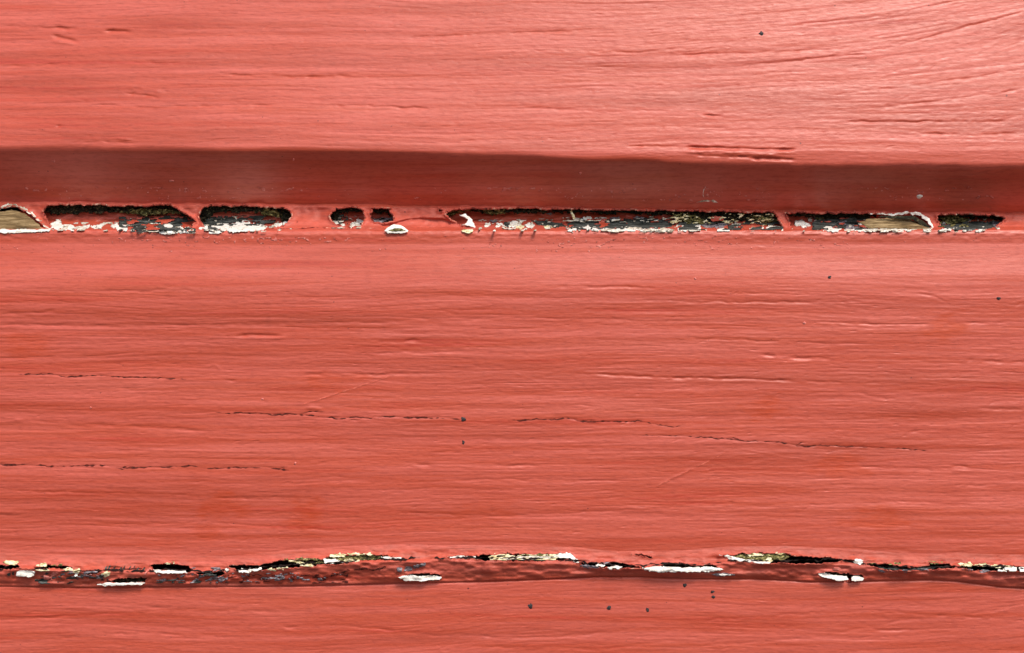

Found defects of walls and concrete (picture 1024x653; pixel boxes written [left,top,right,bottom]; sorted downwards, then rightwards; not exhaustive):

peeling [0,203,292,235]
peeling [330,208,408,234]
peeling [446,208,1004,234]
crack [24,372,176,380]
crack [218,411,460,420]
crack [517,417,926,451]
crack [1,463,286,471]
peeling [228,573,348,583]